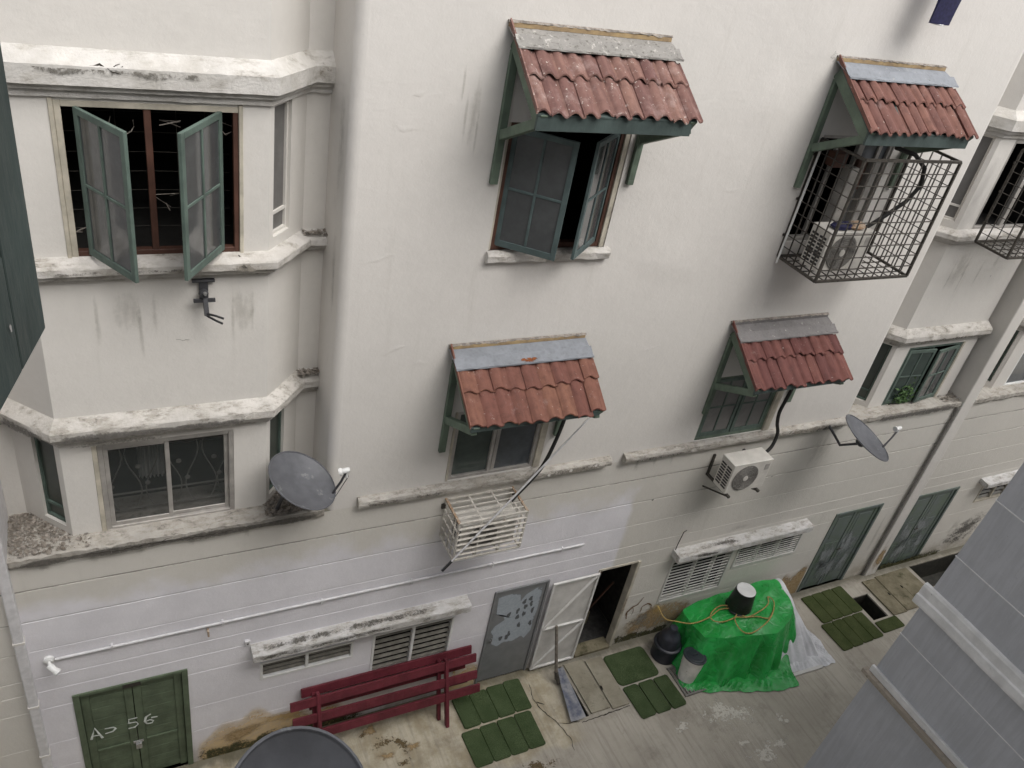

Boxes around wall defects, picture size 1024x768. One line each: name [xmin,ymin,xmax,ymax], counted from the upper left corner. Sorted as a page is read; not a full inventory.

water stain [943,518,981,543]
water stain [204,713,297,759]